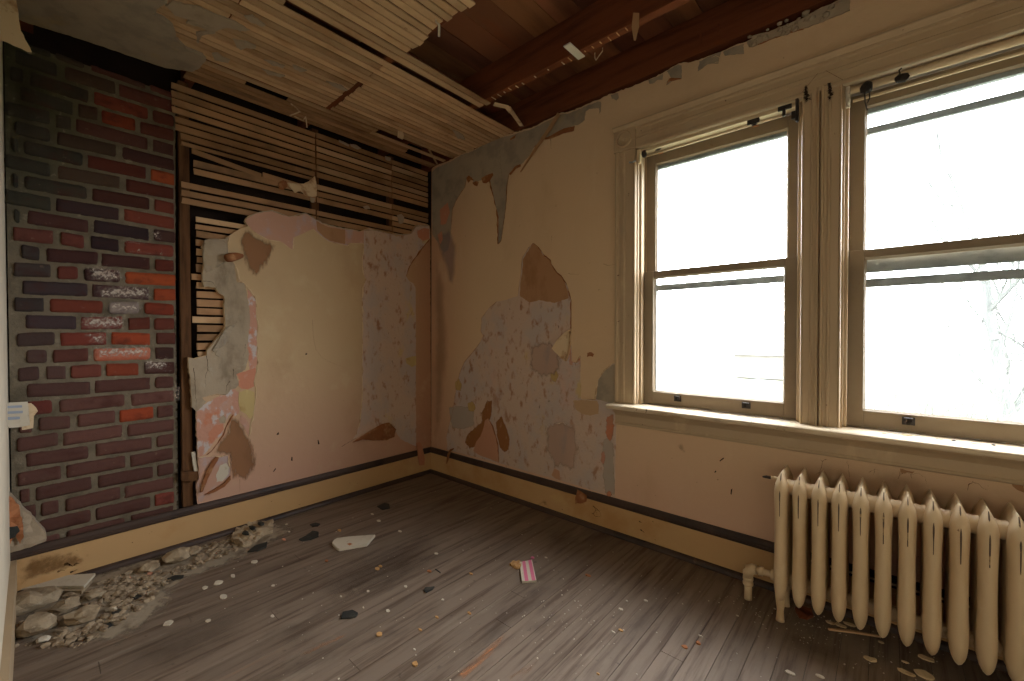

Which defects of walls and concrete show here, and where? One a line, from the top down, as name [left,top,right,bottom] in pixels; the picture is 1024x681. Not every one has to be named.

spalling [698,0,850,71]
spalling [21,25,601,509]
flaking render [596,364,615,403]